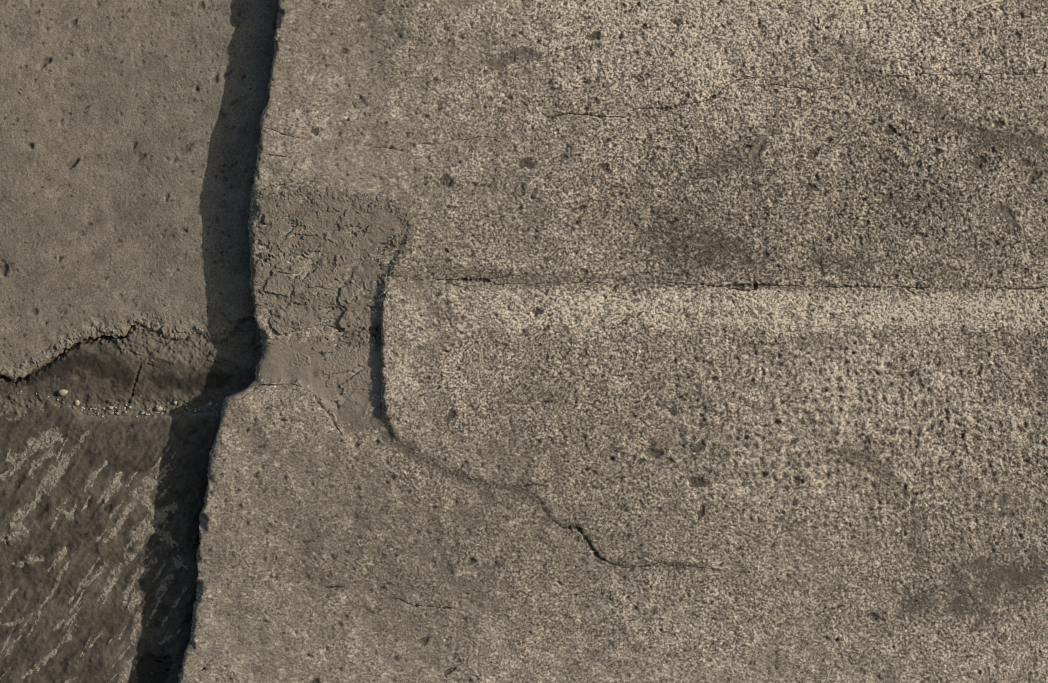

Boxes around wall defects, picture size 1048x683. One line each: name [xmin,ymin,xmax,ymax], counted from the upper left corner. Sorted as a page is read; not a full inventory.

crack [538,75,835,118]
spalling [0,178,420,428]
crack [128,360,159,406]
crack [518,483,724,597]